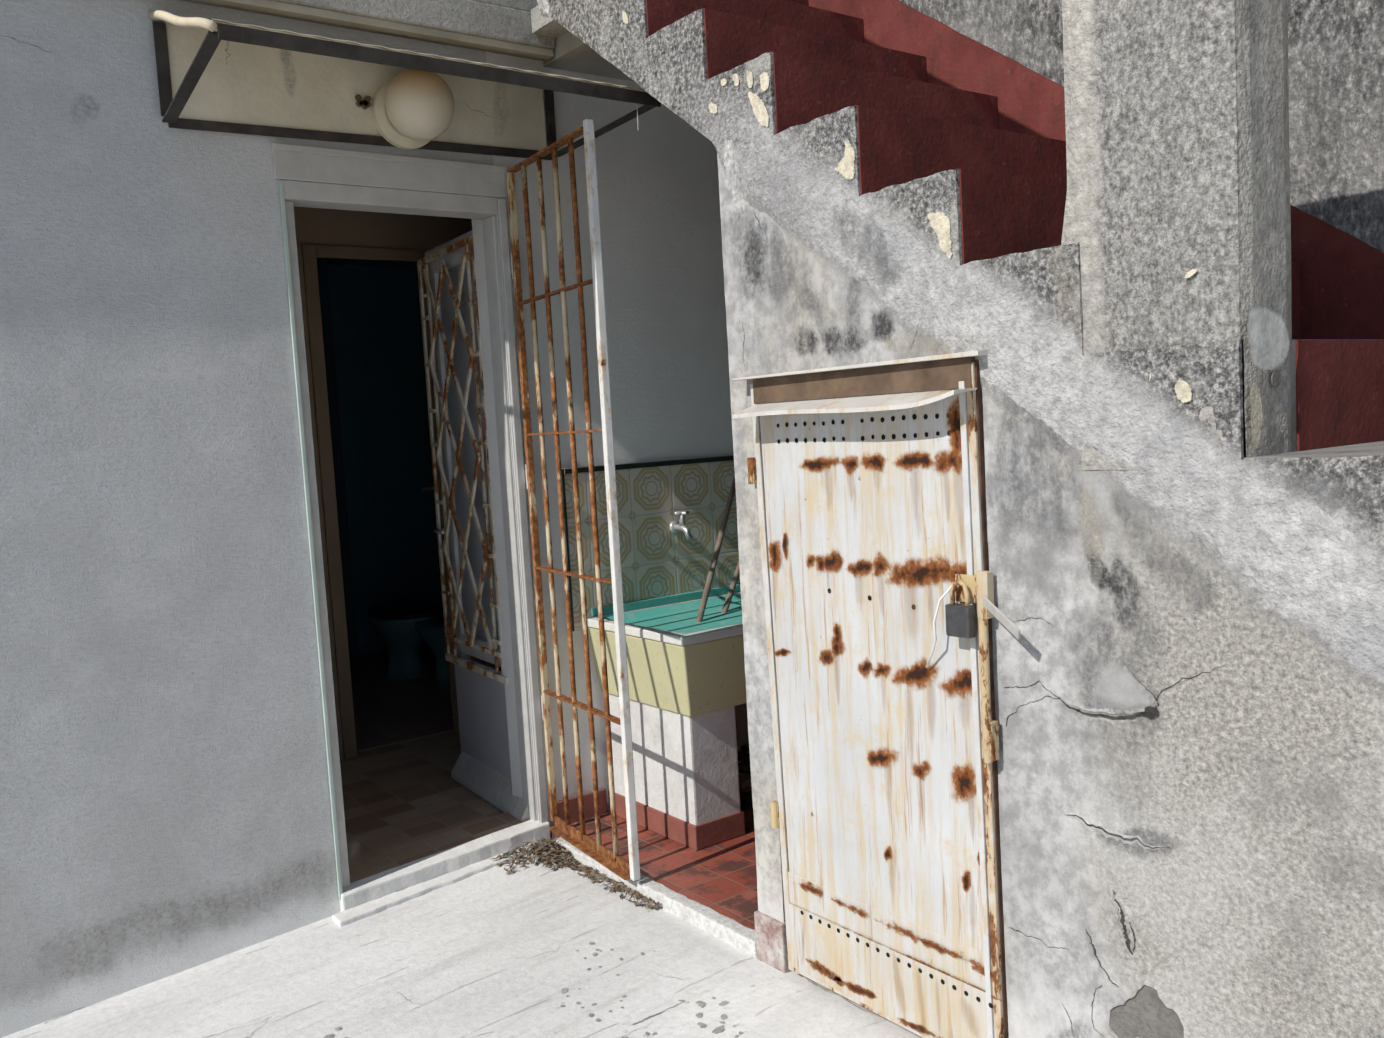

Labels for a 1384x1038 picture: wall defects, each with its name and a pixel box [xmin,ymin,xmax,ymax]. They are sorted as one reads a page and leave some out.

peeling [721,71,769,127]
peeling [834,140,855,180]
damp [735,216,819,309]
damp [799,278,859,354]
damp [873,312,947,352]
rust [801,360,989,587]
rust [858,659,972,698]
crack [1004,660,1225,727]
crack [1064,810,1168,852]
rust [800,760,1009,1038]
crack [1009,890,1136,1035]
spalling [1105,978,1192,1038]